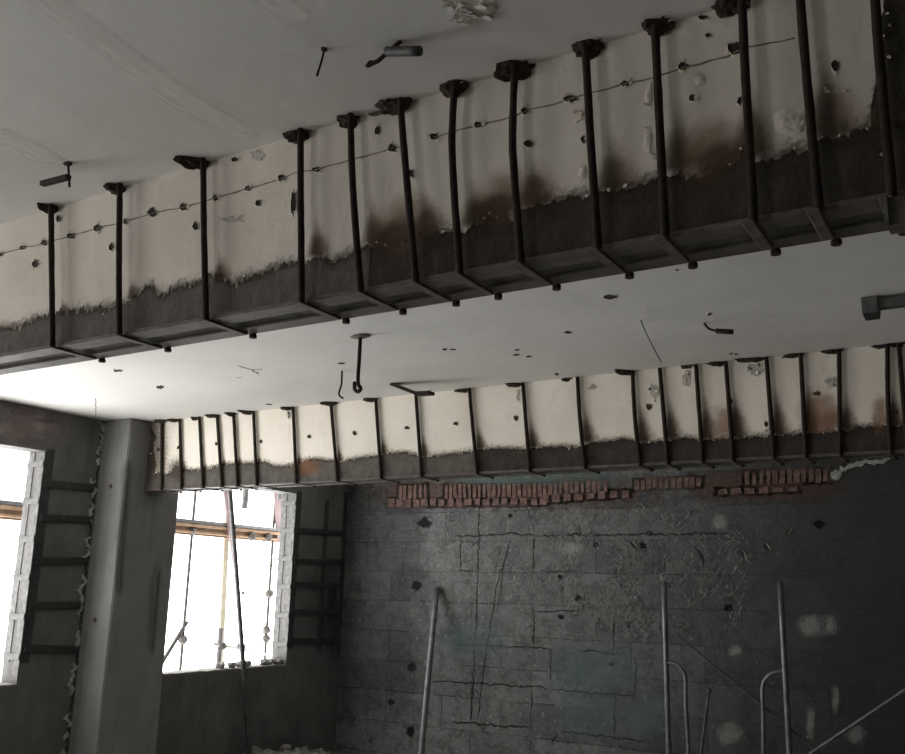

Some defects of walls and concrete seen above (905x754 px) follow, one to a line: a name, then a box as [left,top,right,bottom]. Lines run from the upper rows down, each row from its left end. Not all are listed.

spalling [441,0,497,28]
peeling [0,85,886,354]
flaking render [145,420,888,528]
crack [434,506,729,751]